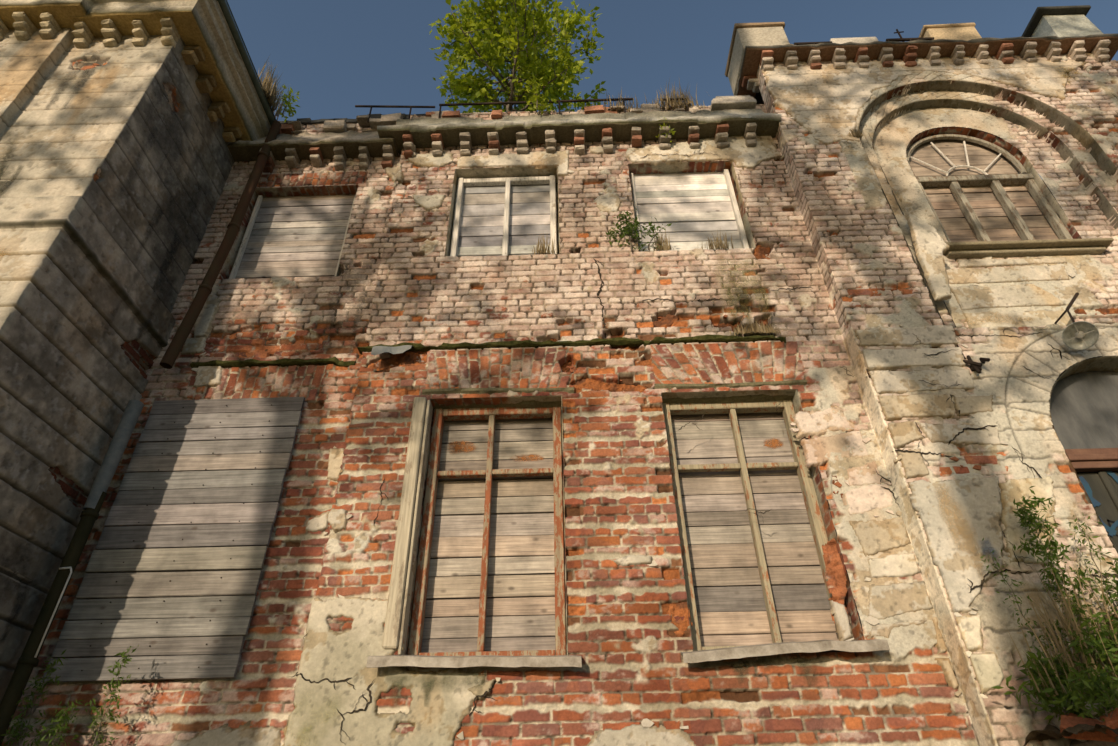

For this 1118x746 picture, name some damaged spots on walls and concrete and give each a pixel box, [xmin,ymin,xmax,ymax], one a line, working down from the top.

crack [593,258,613,339]
spalling [561,360,647,393]
flaking render [790,190,1118,698]
crack [289,672,374,745]
crack [469,681,497,716]